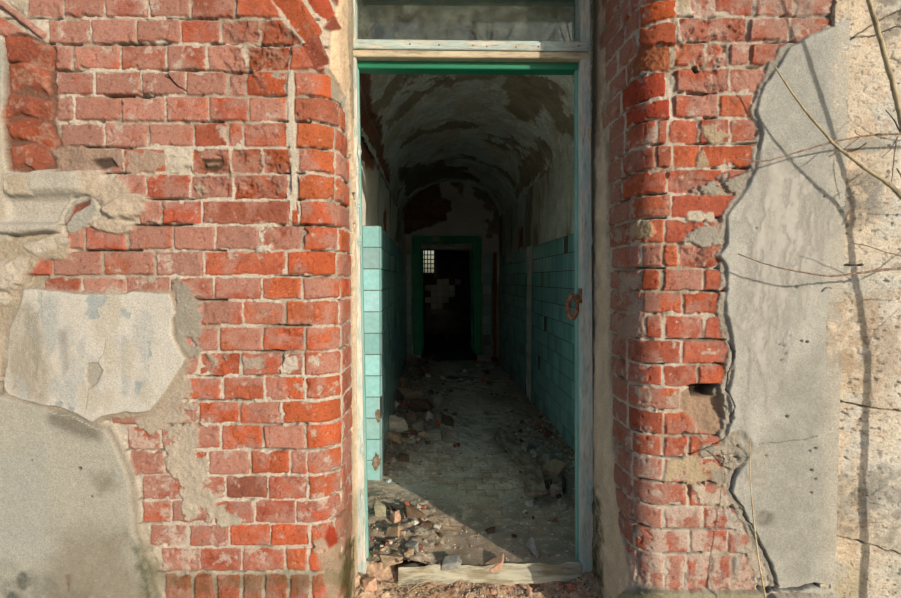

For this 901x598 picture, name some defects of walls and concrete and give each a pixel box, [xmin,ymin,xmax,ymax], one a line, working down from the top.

spalling [220,18,302,87]
spalling [679,18,746,95]
crack [850,9,901,40]
spalling [1,31,123,173]
flaking render [356,74,391,189]
spalling [189,149,291,199]
flaking render [383,183,452,246]
flaking render [0,288,186,422]
spalling [679,383,723,435]
crack [840,400,901,411]
spalling [324,523,340,548]
crack [836,534,901,556]